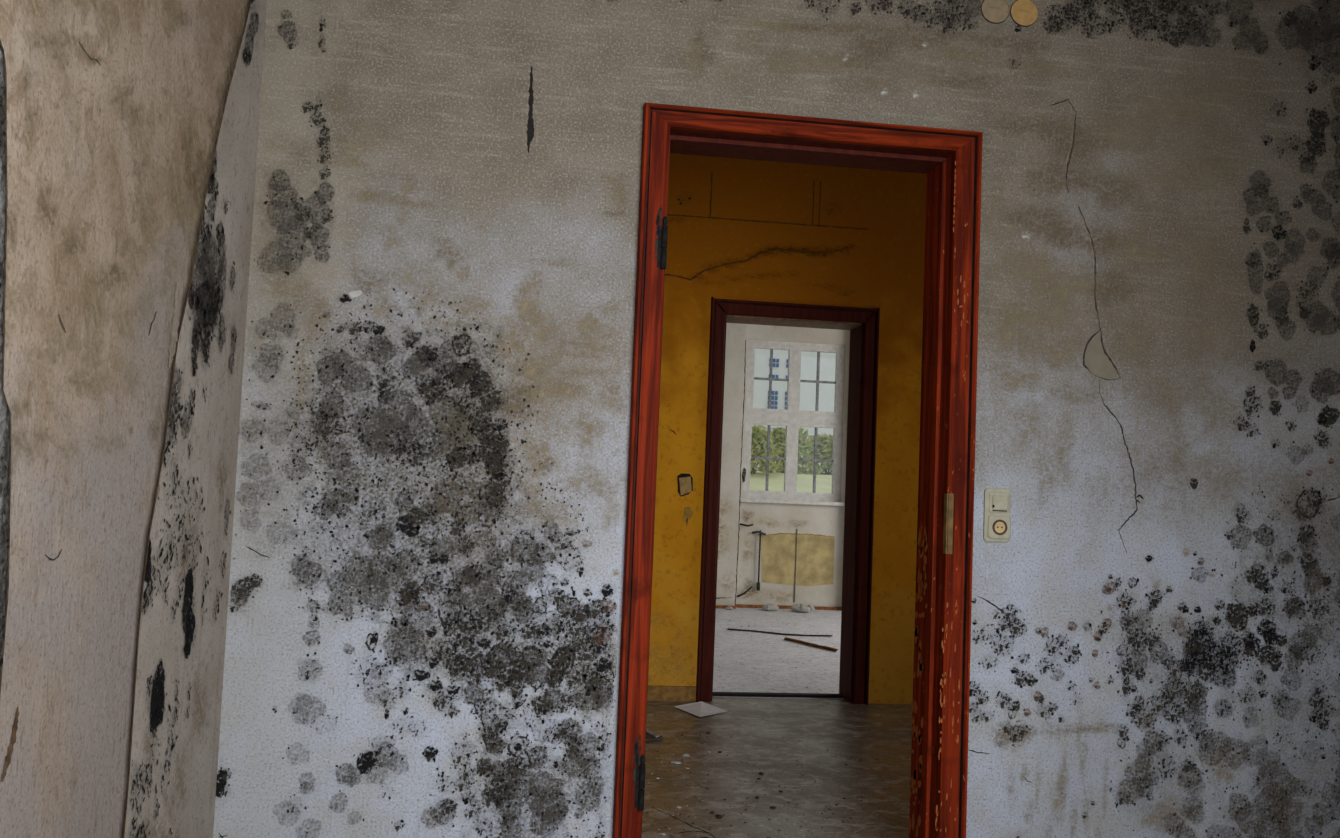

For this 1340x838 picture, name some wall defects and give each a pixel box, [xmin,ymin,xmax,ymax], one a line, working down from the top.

water stain [804,0,981,42]
water stain [254,94,349,277]
crack [1052,99,1100,329]
water stain [1043,0,1340,453]
water stain [130,661,201,838]
water stain [143,130,263,658]
water stain [216,767,231,798]
water stain [242,288,617,838]
crack [1099,380,1144,553]
water stain [969,485,1340,838]